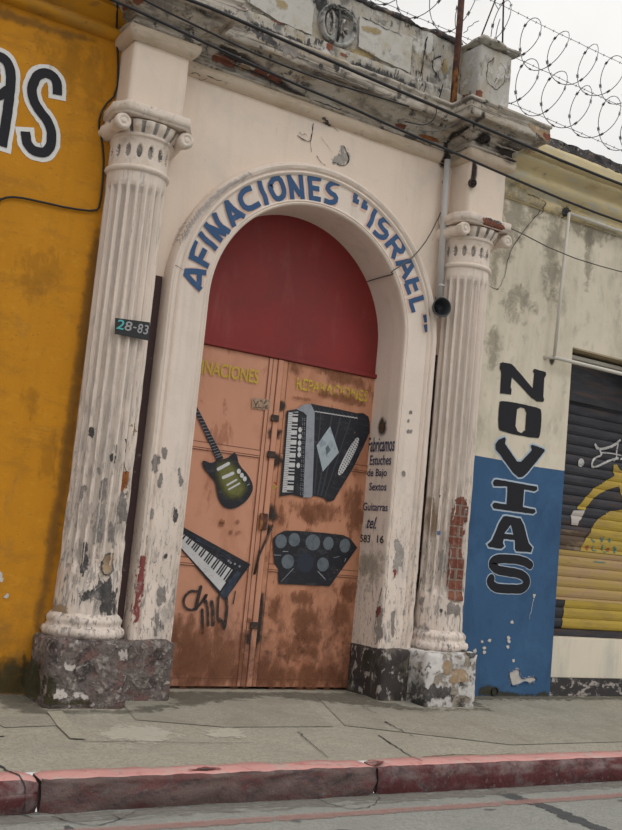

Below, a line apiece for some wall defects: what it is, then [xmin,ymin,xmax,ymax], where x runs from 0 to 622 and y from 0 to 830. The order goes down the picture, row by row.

flaking render [212,53,283,83]
peeling [245,26,299,60]
peeling [151,447,168,488]
peeling [79,467,146,623]
flaking render [437,497,468,617]
peeling [153,586,166,636]
corrosion [330,583,357,624]
water stain [0,655,87,705]
corrosion [171,613,248,689]
corrosion [258,590,346,690]
peeling [408,660,469,702]
peeling [508,659,537,686]